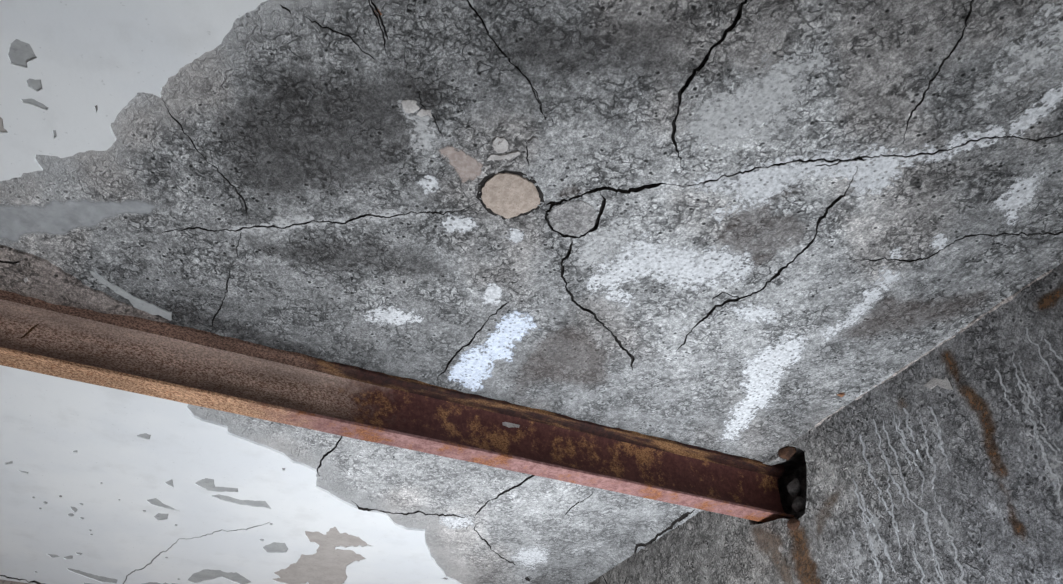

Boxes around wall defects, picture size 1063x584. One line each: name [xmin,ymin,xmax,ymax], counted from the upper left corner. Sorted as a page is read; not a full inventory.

crack [155,91,478,327]
water stain [217,209,427,237]
water stain [416,175,440,197]
water stain [439,213,478,233]
peeling [0,0,1063,462]
crack [545,0,1063,371]
rust [943,351,1007,487]
peeling [143,569,251,584]
peeling [187,404,703,584]
crack [634,510,694,553]
rust [753,518,820,584]
rust [1010,508,1025,538]